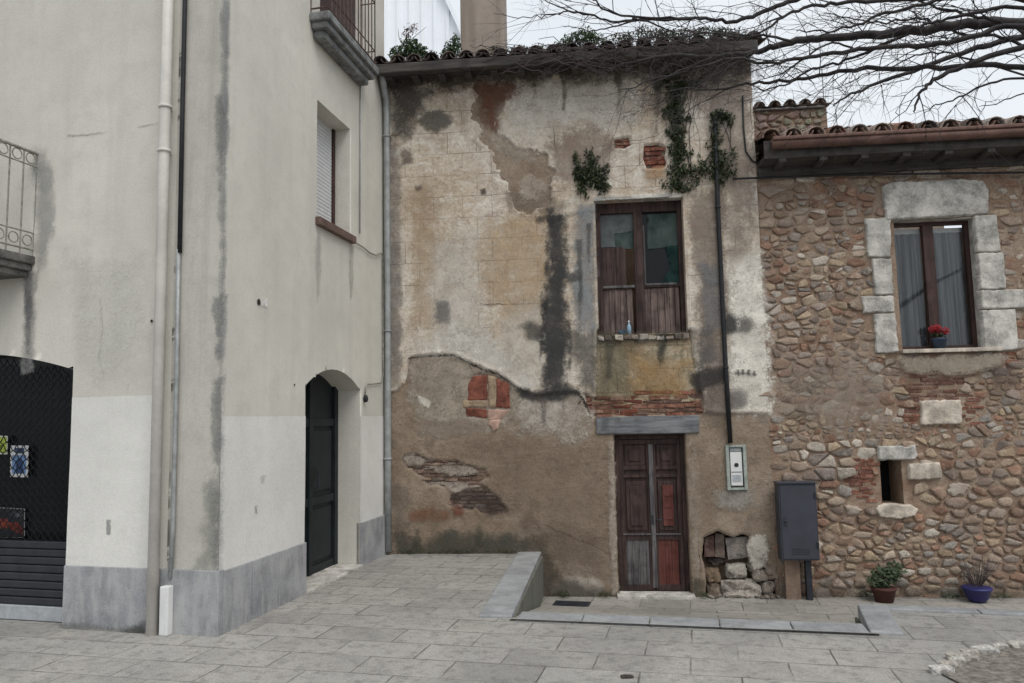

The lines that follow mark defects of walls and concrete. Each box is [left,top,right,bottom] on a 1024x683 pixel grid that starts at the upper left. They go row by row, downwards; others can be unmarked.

damp [221,0,230,54]
damp [216,87,229,151]
flaking render [547,128,630,180]
spalling [585,73,757,417]
damp [25,289,34,328]
damp [213,295,227,353]
damp [517,203,598,421]
damp [690,263,753,409]
damp [212,382,223,462]
spalling [463,374,511,432]
spalling [402,452,505,515]